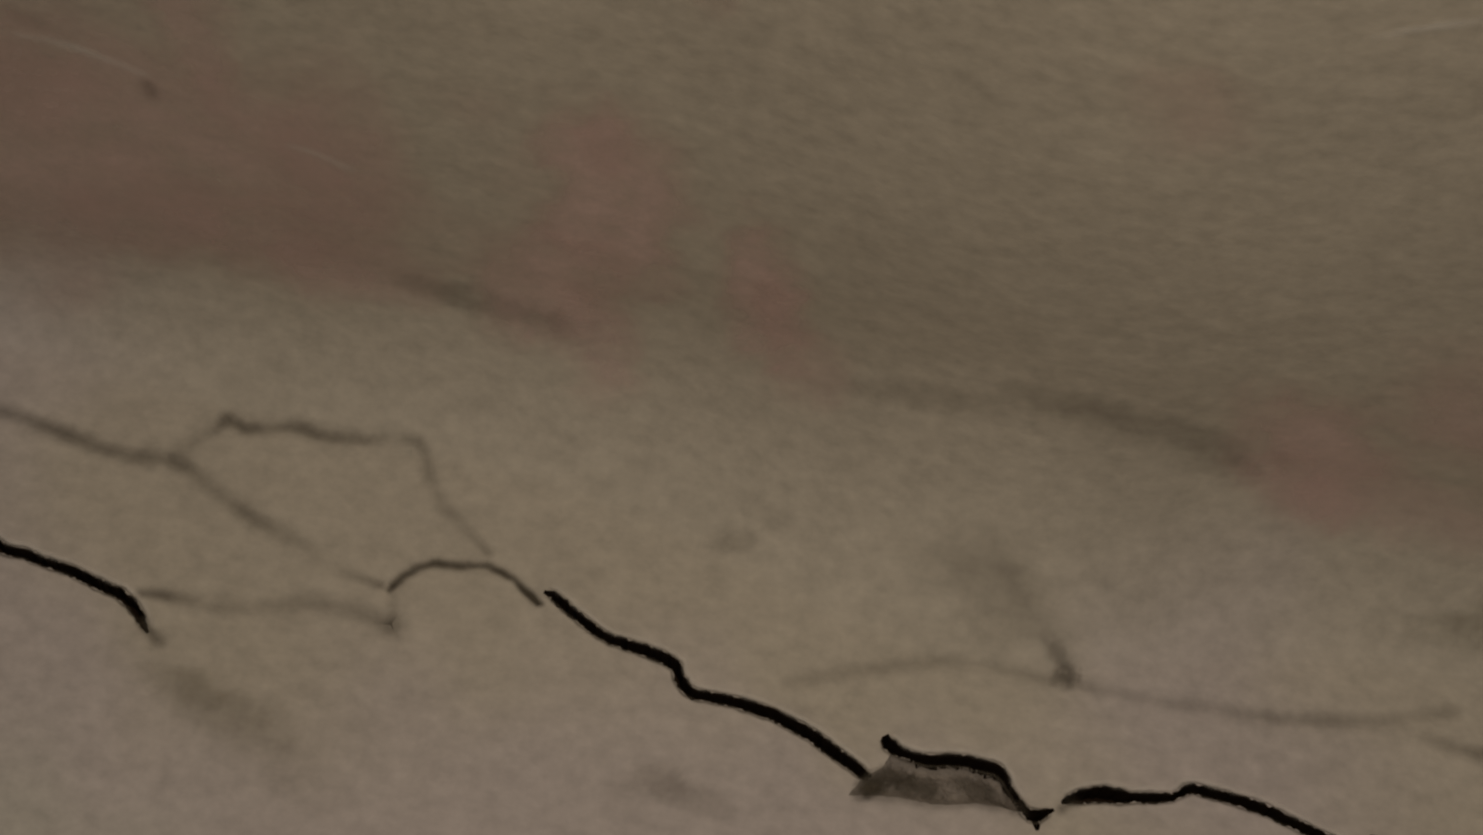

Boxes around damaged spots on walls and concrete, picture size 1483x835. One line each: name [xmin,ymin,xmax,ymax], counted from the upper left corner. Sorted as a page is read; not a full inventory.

crack [0,539,149,634]
crack [390,561,872,780]
crack [1061,783,1334,835]